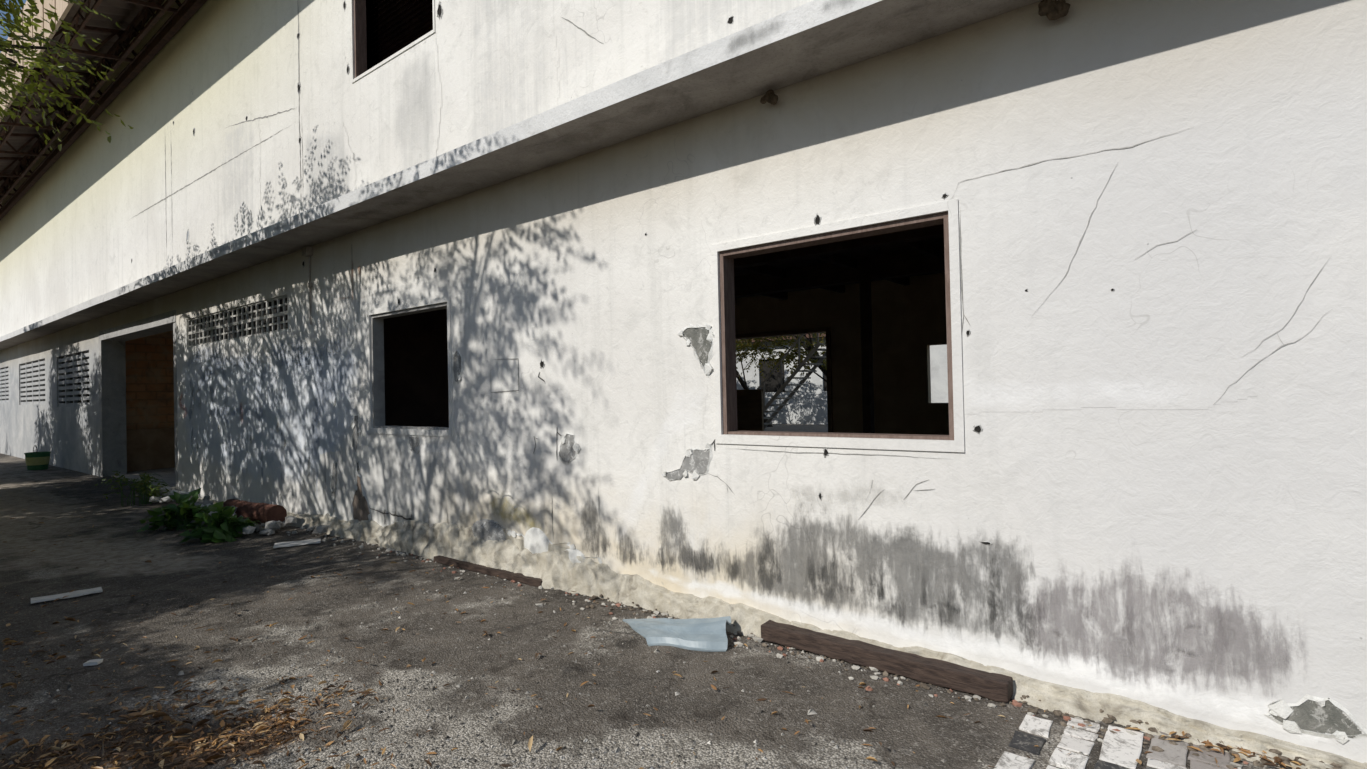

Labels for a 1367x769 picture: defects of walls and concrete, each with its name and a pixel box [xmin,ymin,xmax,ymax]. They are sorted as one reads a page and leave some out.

crack [950,127,1193,328]
spalling [677,323,714,378]
crack [1213,258,1330,405]
water stain [583,384,708,562]
spalling [662,443,713,481]
water stain [647,514,1337,747]
spalling [1264,694,1367,744]